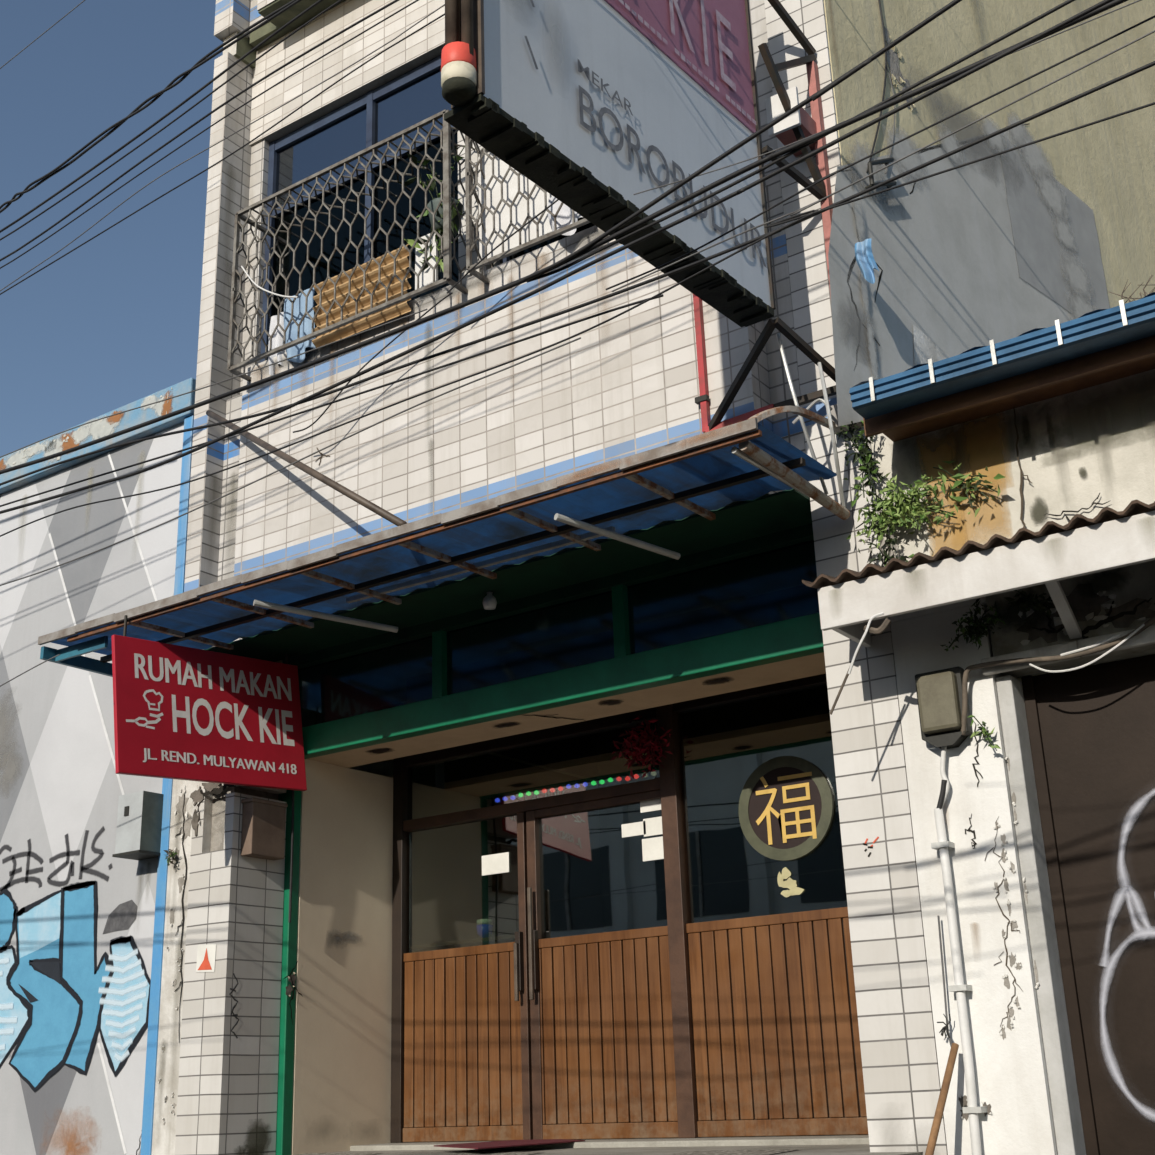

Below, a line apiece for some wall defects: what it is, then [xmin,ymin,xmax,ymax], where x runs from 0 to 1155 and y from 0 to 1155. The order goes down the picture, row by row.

peeling [141,387,172,416]
peeling [0,411,124,470]
crack [1014,409,1111,528]
crack [1032,597,1155,639]
crack [174,784,236,1019]